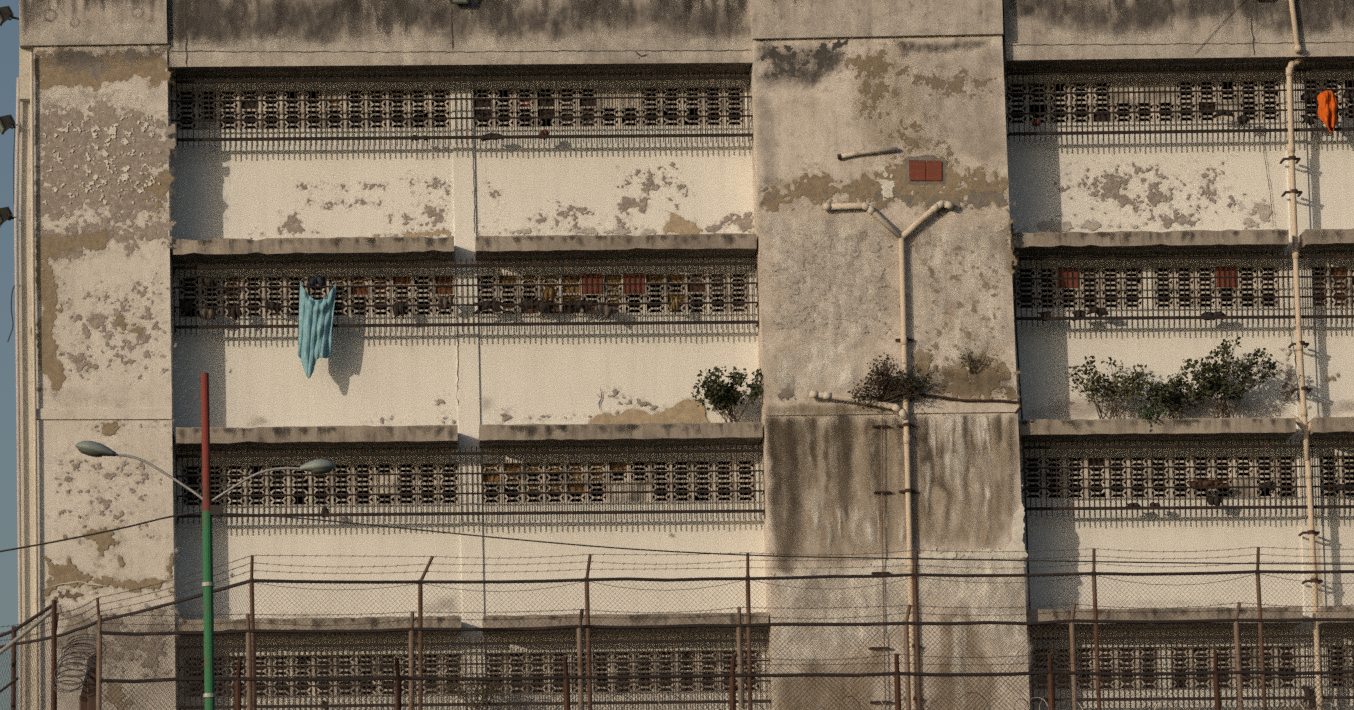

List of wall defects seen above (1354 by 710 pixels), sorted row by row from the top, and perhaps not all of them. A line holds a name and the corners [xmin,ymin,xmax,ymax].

water stain [144,0,743,61]
water stain [1014,0,1354,31]
peeling [29,44,176,392]
peeling [250,177,451,239]
spalling [499,49,1020,402]
water stain [775,224,876,388]
water stain [922,229,1023,360]
peeling [1038,161,1272,232]
peeling [42,460,182,710]
water stain [767,406,1026,710]